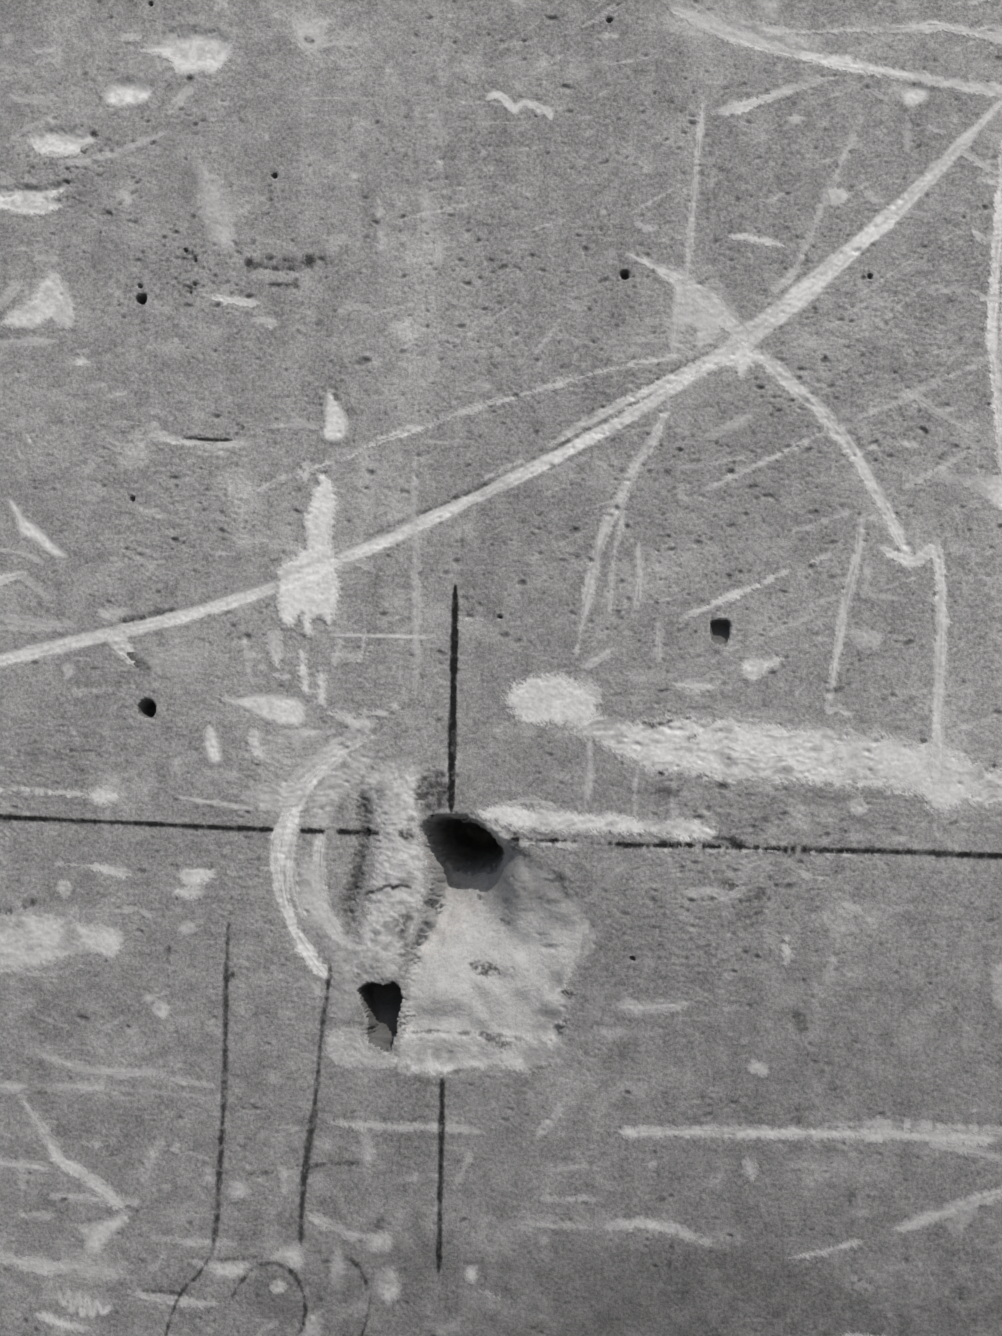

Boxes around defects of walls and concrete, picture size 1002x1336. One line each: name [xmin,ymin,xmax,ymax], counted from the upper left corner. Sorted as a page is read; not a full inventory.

peeling [551,899,602,962]
peeling [306,976,361,1022]